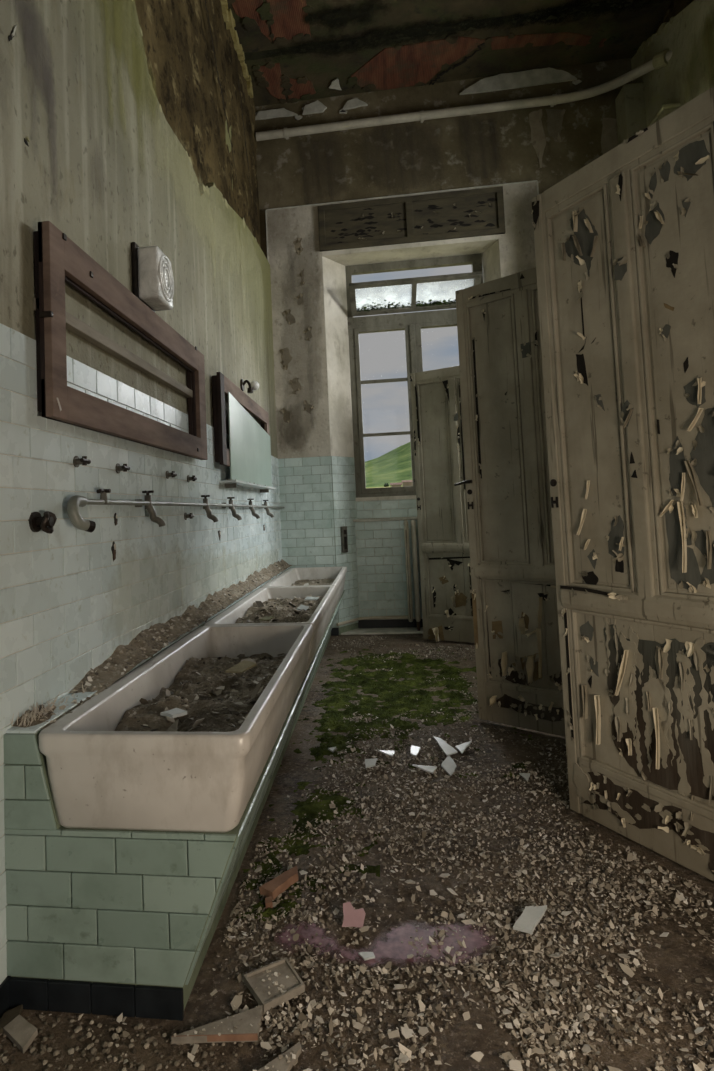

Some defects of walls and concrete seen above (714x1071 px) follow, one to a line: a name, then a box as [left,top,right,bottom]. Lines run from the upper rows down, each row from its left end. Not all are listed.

leakage [17,0,54,162]
flaking render [134,0,314,246]
flaking render [329,33,492,92]
leakage [274,0,653,58]